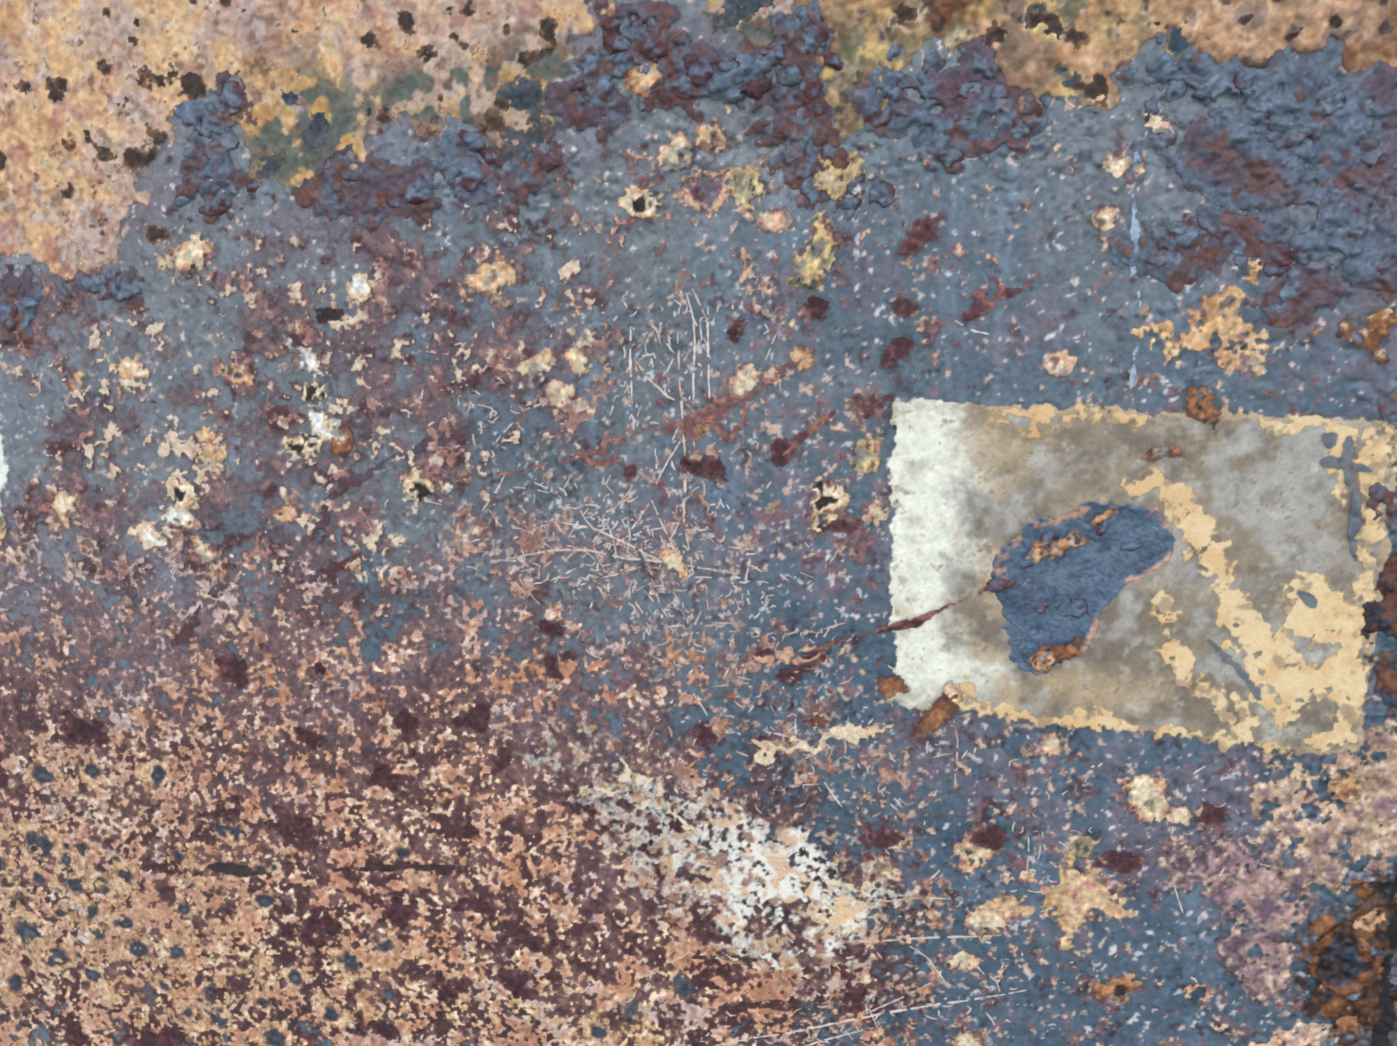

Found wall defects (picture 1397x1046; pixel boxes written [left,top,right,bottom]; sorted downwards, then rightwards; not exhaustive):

rust [703,0,1397,140]
rust [1113,136,1146,185]
rust [0,0,999,1046]
peeling [986,501,1175,675]